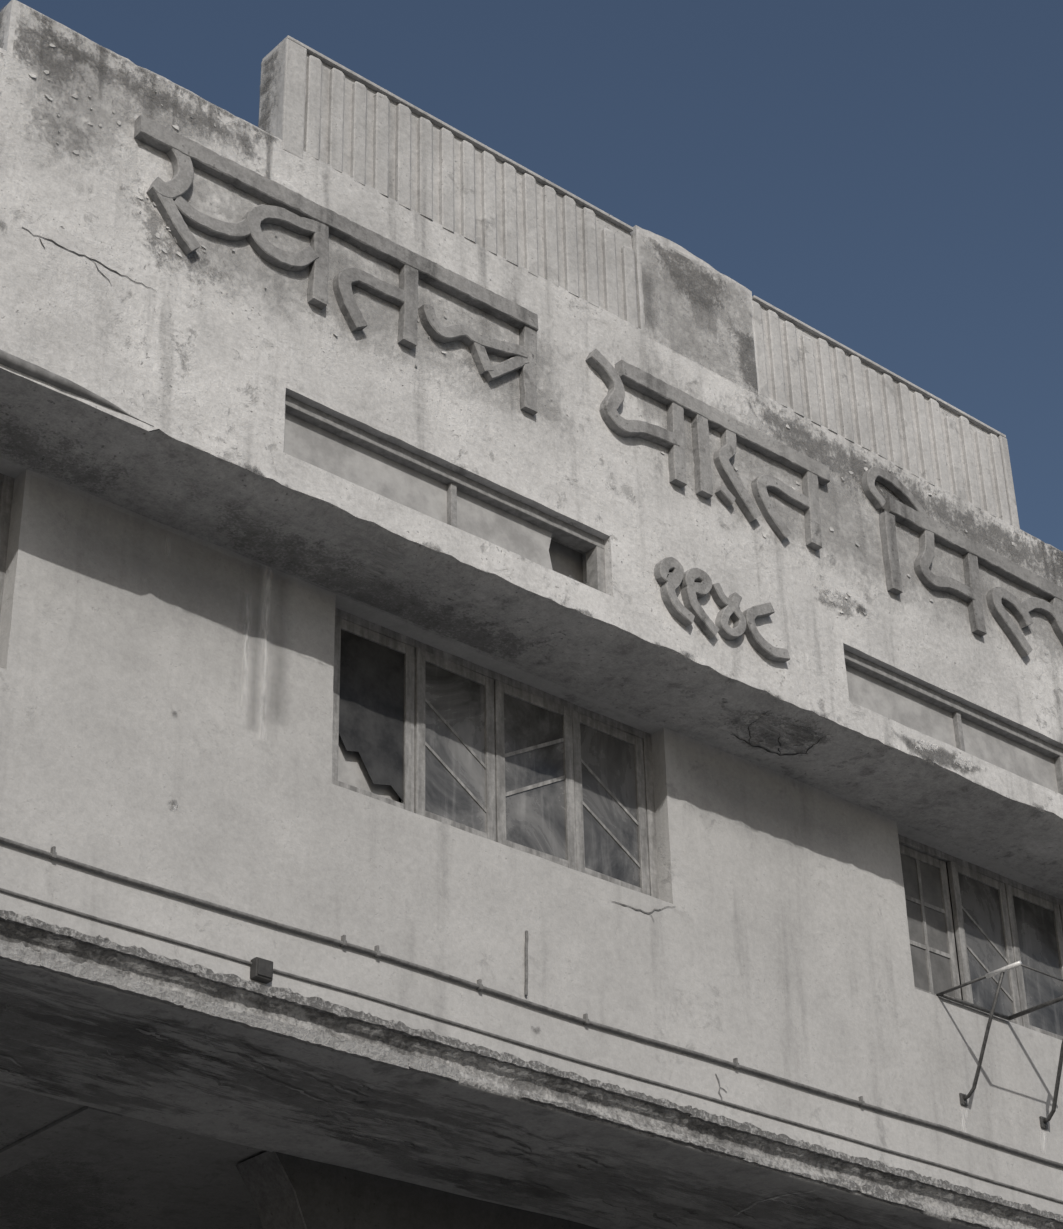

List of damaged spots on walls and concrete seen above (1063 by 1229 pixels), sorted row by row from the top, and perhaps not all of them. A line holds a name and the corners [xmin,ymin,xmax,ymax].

leakage [2,10,276,159]
crack [22,227,157,292]
leakage [653,240,723,307]
leakage [0,349,154,427]
peeling [0,910,1063,1224]
peeling [950,1217,1002,1229]